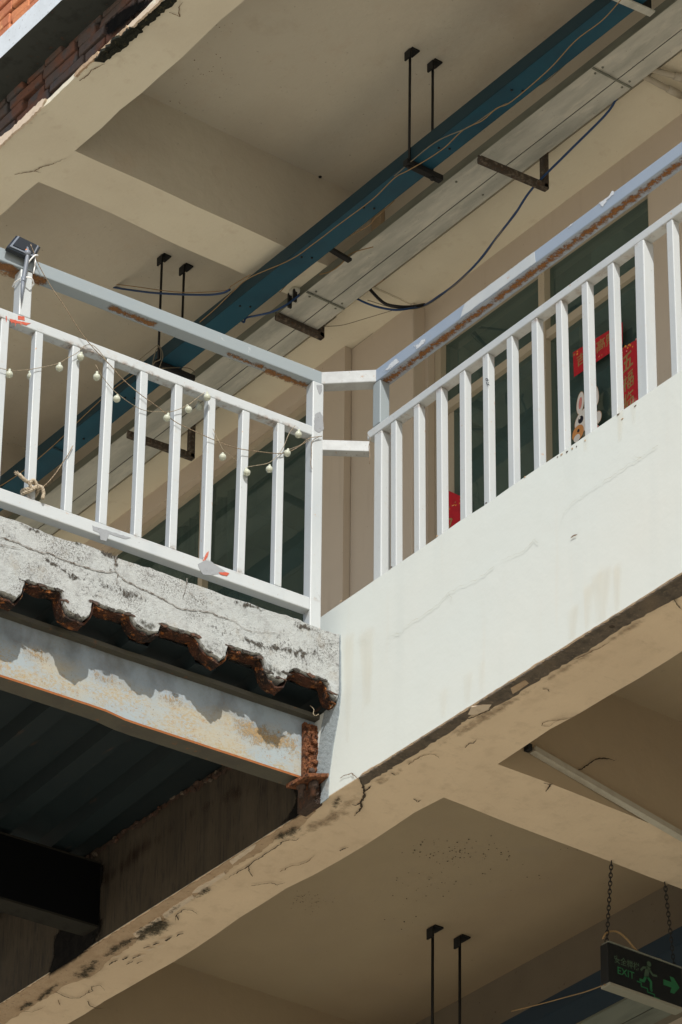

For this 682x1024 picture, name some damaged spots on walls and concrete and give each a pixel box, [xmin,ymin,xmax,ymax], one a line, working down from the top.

corrosion [382,158,682,383]
spalling [89,599,143,629]
crack [0,537,277,634]
corrosion [0,583,336,710]
peeling [0,635,341,1024]
crack [225,839,314,886]
crack [341,754,438,816]
mould [75,907,177,978]